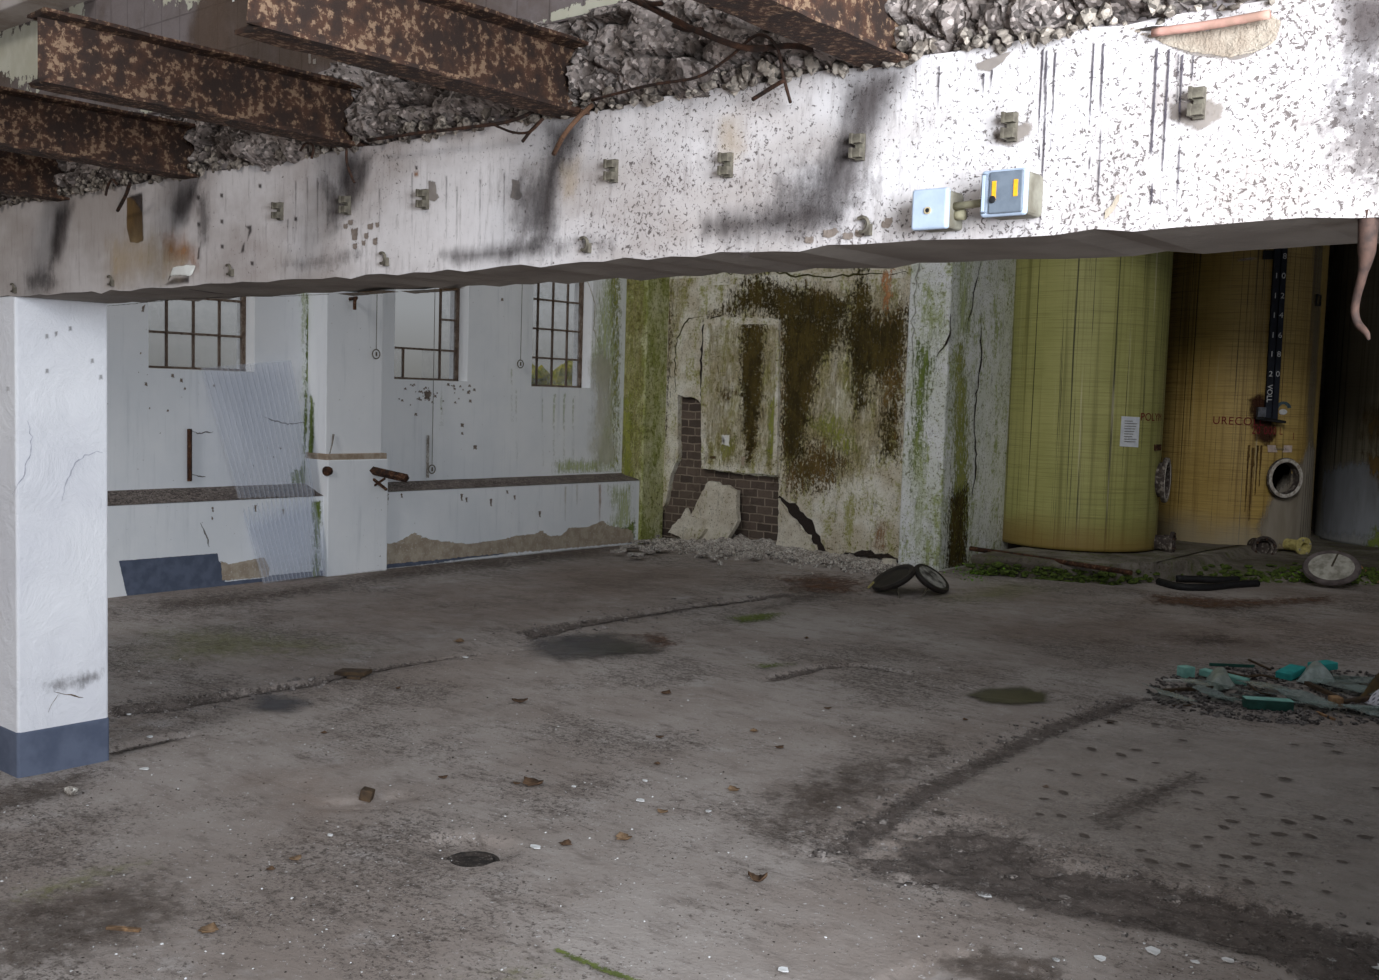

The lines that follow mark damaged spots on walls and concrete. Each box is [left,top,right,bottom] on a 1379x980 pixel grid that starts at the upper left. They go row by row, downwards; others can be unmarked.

spalling [0,0,1281,212]
peeling [343,220,379,249]
peeling [805,228,864,244]
peeling [387,521,634,564]
peeling [220,558,269,581]